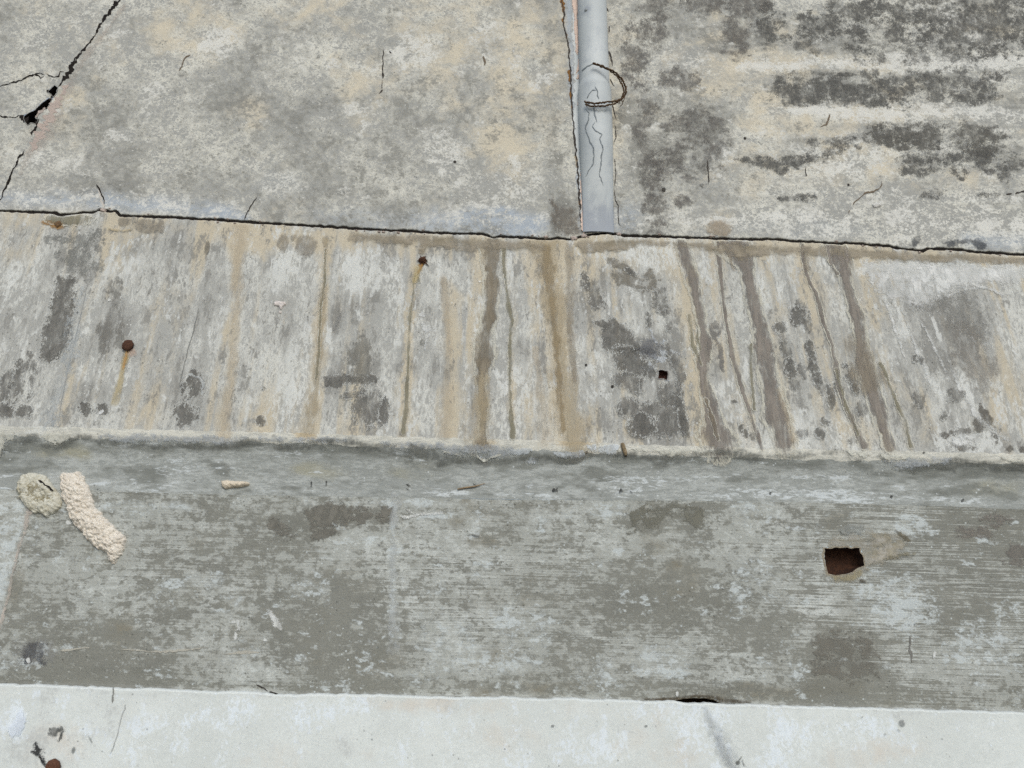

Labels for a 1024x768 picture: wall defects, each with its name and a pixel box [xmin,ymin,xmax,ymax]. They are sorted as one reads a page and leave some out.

crack [0,0,1024,256]
leakage [297,237,328,382]
rust [400,263,423,434]
leakage [348,0,1024,469]
efflorescence [42,432,69,445]
spalling [823,525,915,582]